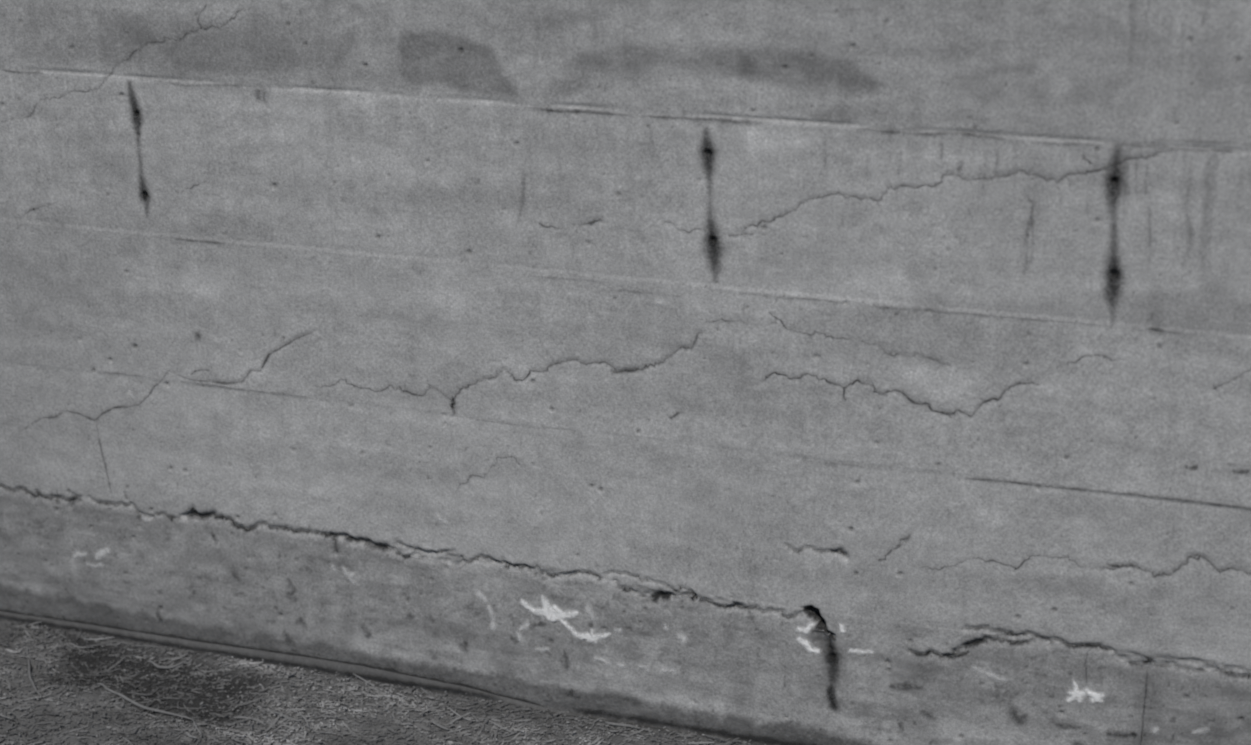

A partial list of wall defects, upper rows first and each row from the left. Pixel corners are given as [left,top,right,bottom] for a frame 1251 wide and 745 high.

crack [0,485,127,506]
crack [168,508,411,558]
crack [550,571,788,618]
damp [511,596,624,666]
damp [796,623,820,654]
crack [914,627,1148,707]
damp [1066,682,1104,703]